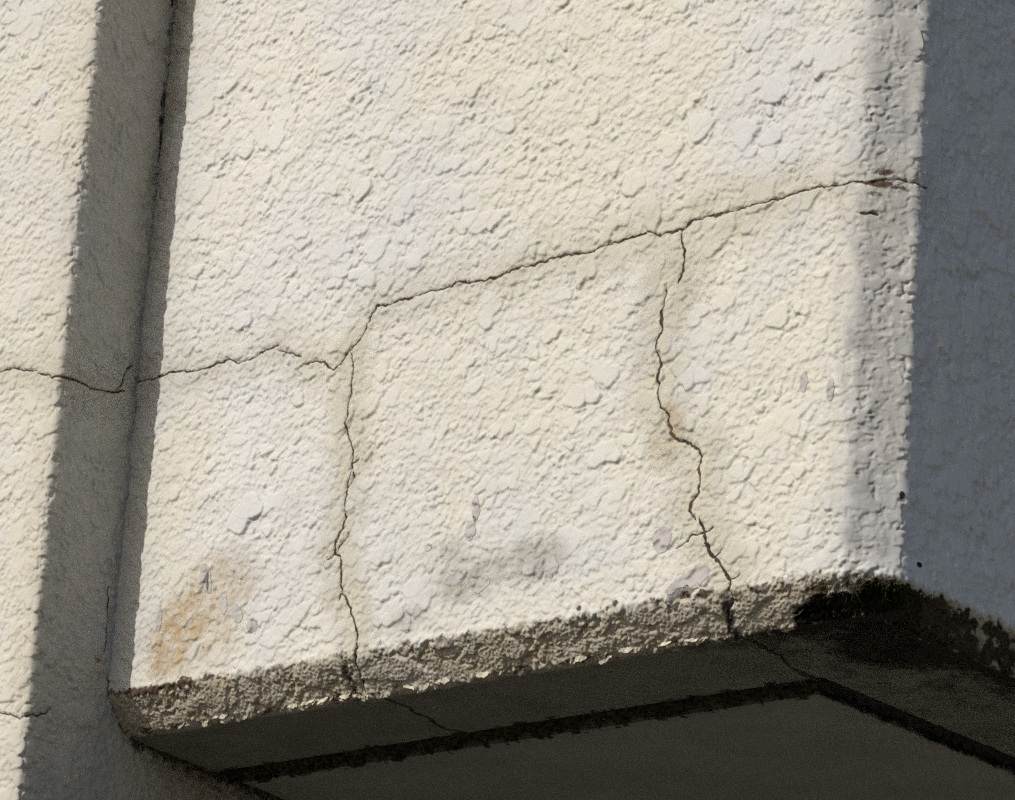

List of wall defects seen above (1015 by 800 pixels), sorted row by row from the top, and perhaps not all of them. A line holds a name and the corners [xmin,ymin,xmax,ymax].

crack [158,64,170,157]
leakage [684,179,822,228]
crack [0,178,928,733]
leakage [643,218,1015,700]
rust [154,598,204,671]